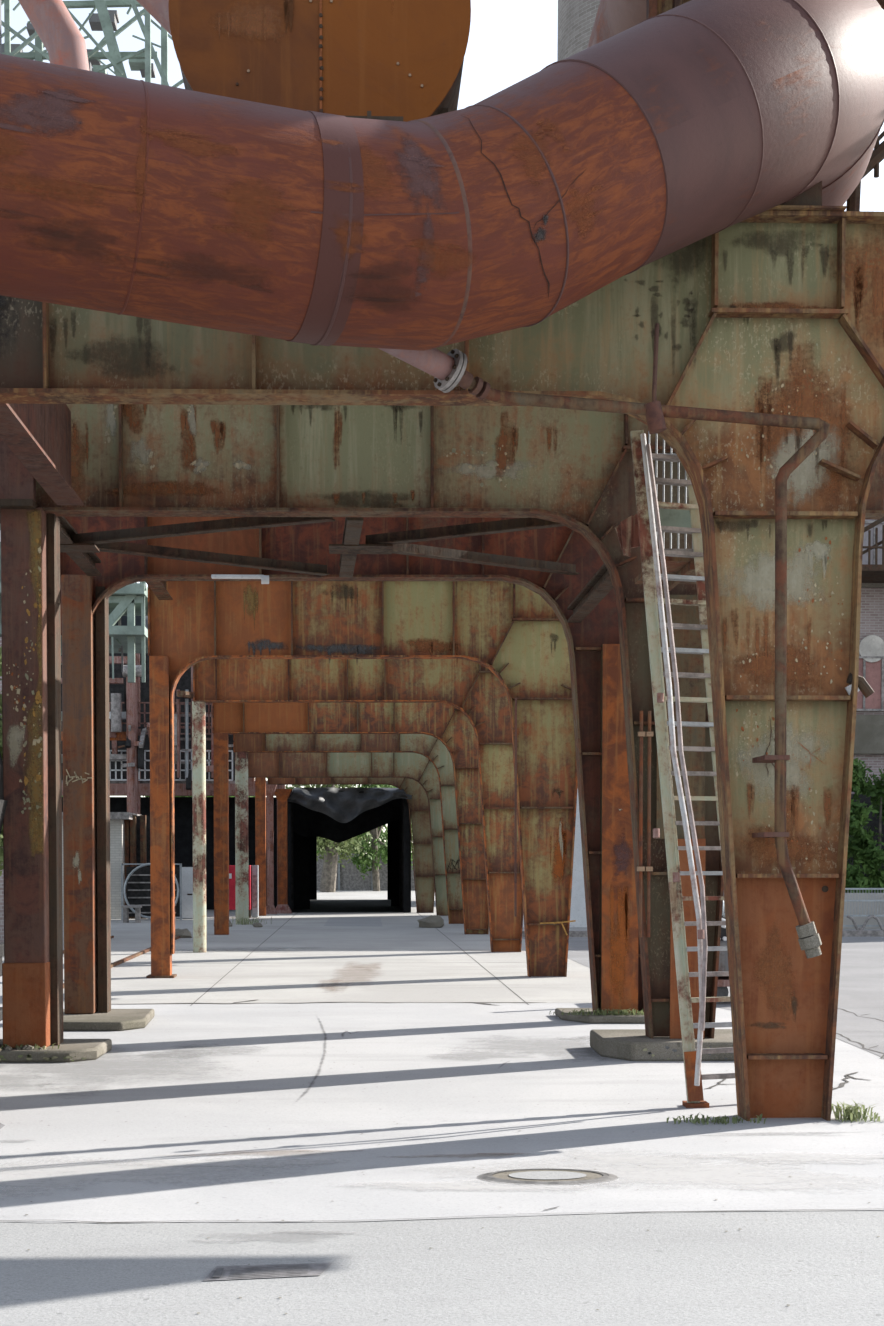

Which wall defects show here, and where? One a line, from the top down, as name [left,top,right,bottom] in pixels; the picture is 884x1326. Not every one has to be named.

damp [0,89,95,133]
corrosion [0,54,666,351]
crack [461,115,583,297]
corrosion [180,407,226,472]
corrosion [334,411,342,469]
corrosion [755,345,851,501]